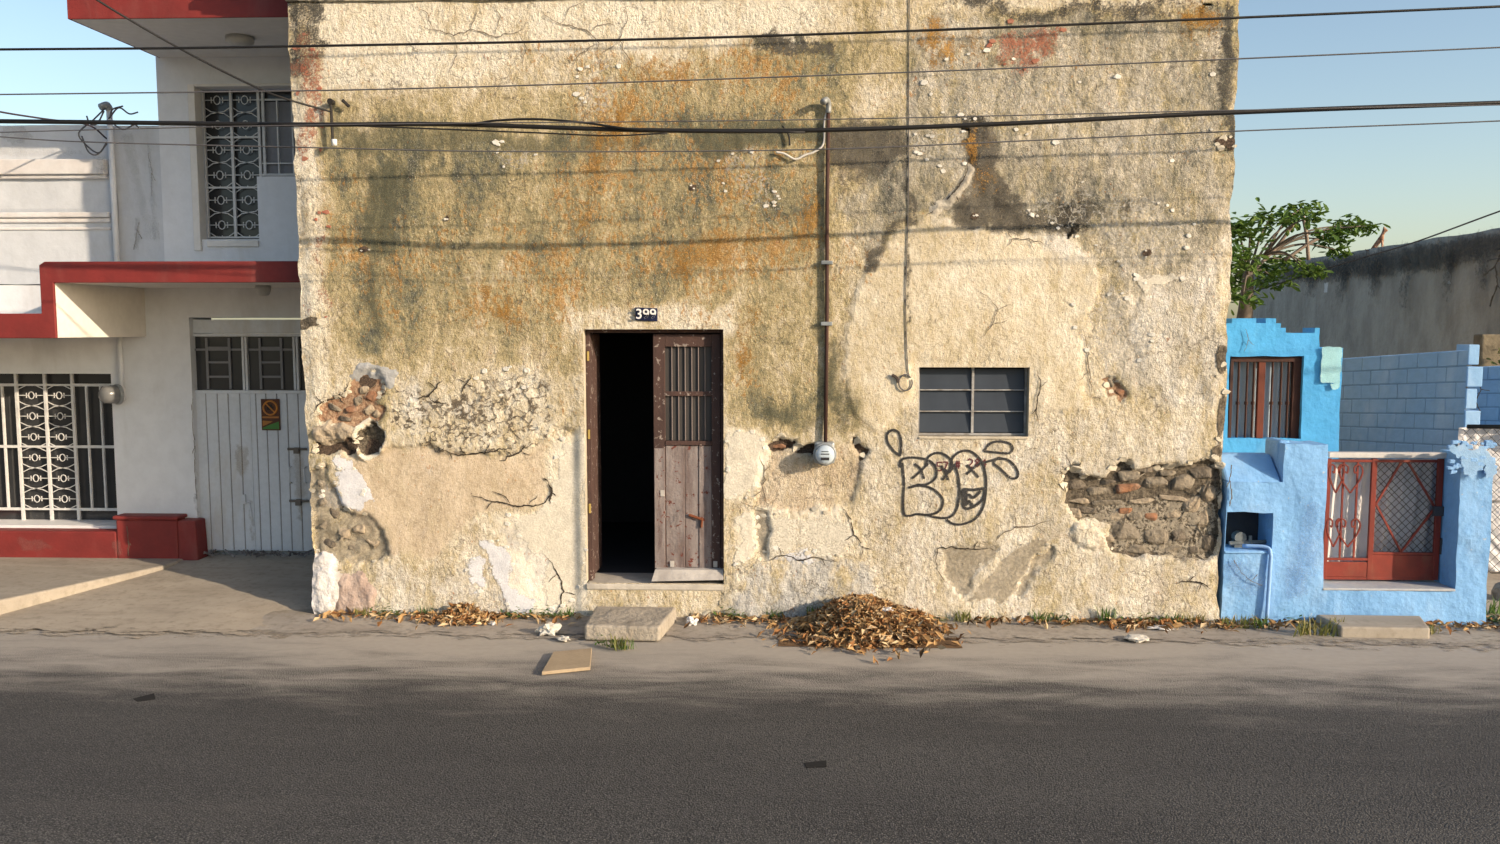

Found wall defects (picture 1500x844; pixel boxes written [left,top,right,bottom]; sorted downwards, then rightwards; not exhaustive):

damp [289,1,330,82]
damp [754,27,835,58]
damp [937,0,1236,147]
damp [345,127,561,269]
damp [634,116,917,273]
peeling [913,133,967,173]
damp [953,111,1105,235]
crack [418,375,472,404]
peeling [309,365,588,615]
crack [436,443,556,509]
spalling [1059,345,1231,564]